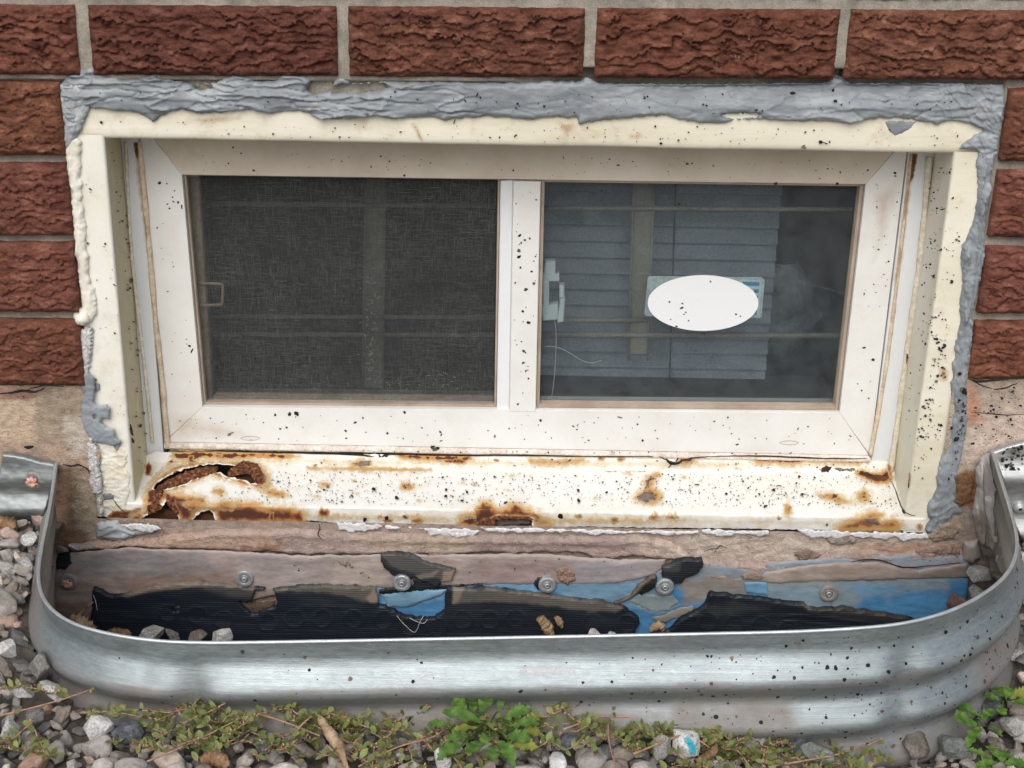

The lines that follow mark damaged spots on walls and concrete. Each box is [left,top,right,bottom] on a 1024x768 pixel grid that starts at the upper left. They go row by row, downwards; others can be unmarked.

corrosion [107,449,474,522]
corrosion [363,515,425,524]
corrosion [457,457,678,526]
corrosion [753,460,903,532]
spalling [555,567,576,585]